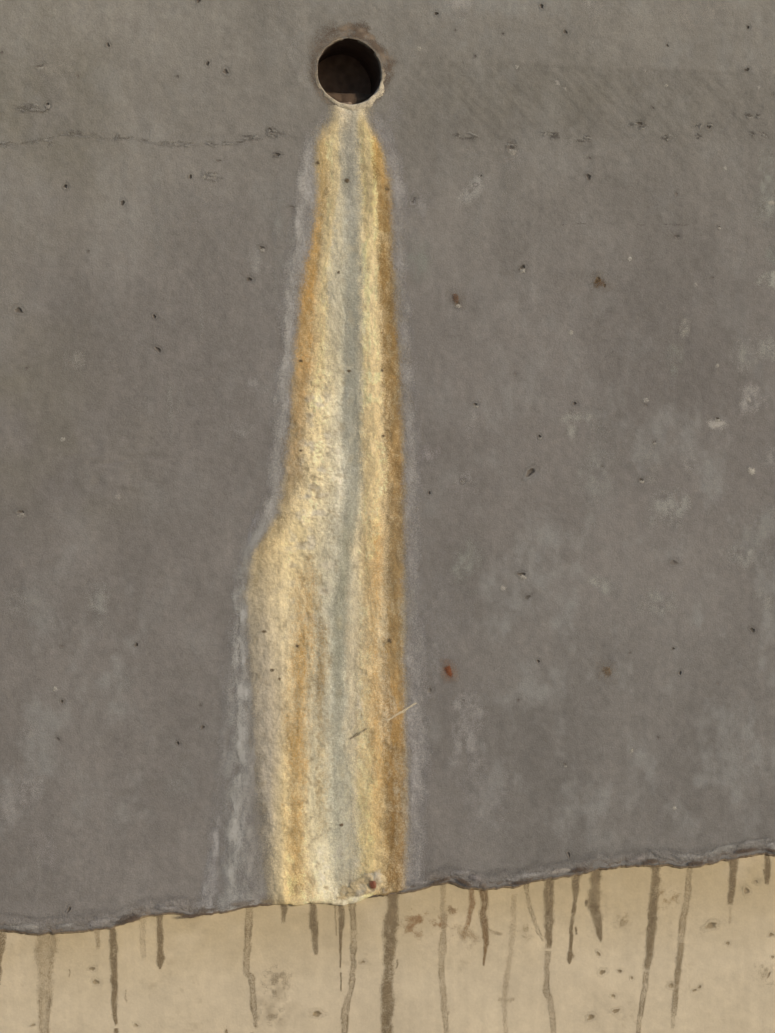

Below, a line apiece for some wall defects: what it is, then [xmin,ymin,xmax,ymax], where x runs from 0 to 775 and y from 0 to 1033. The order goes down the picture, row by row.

water stain [0,931,8,985]
water stain [33,934,60,1033]
water stain [94,928,119,1033]
water stain [139,915,166,969]
water stain [438,879,556,1033]
water stain [567,870,604,964]
water stain [636,867,661,1033]
water stain [671,868,693,1028]
water stain [727,859,739,924]
water stain [763,855,772,885]